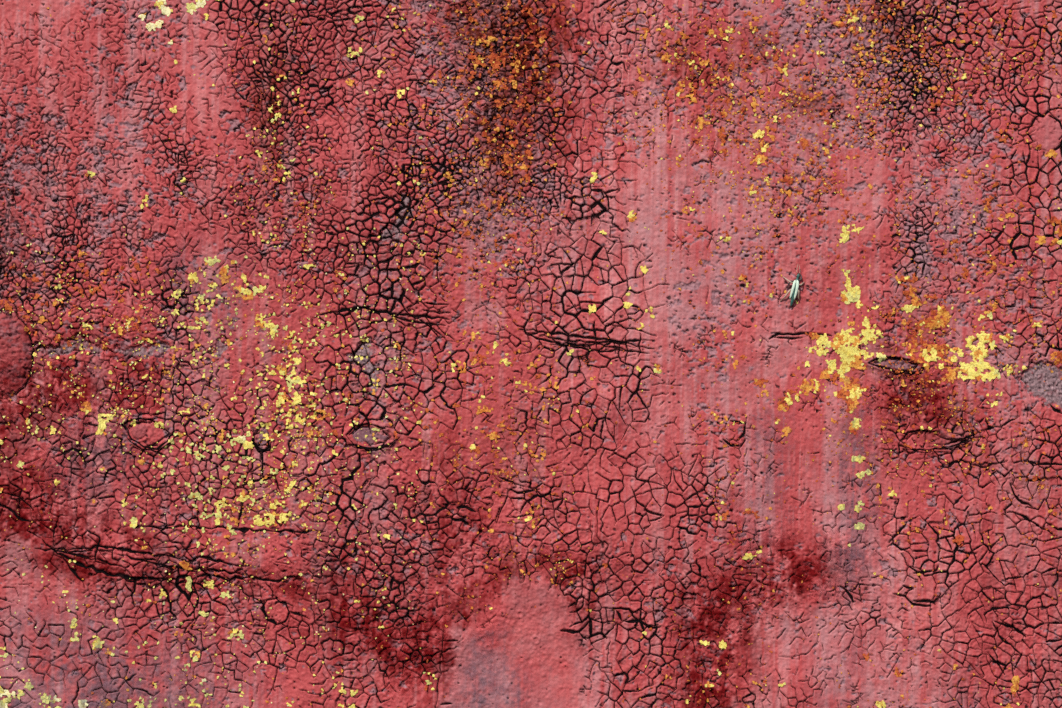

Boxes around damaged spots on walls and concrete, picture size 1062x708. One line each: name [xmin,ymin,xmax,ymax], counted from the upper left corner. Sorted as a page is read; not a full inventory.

rust [393,0,590,276]
rust [592,0,1062,327]
crack [0,0,802,708]
crack [736,271,839,429]
spalling [753,181,1062,579]
rust [675,402,786,533]
peeling [719,536,775,606]
peeling [684,636,741,708]
peeling [993,657,1026,708]